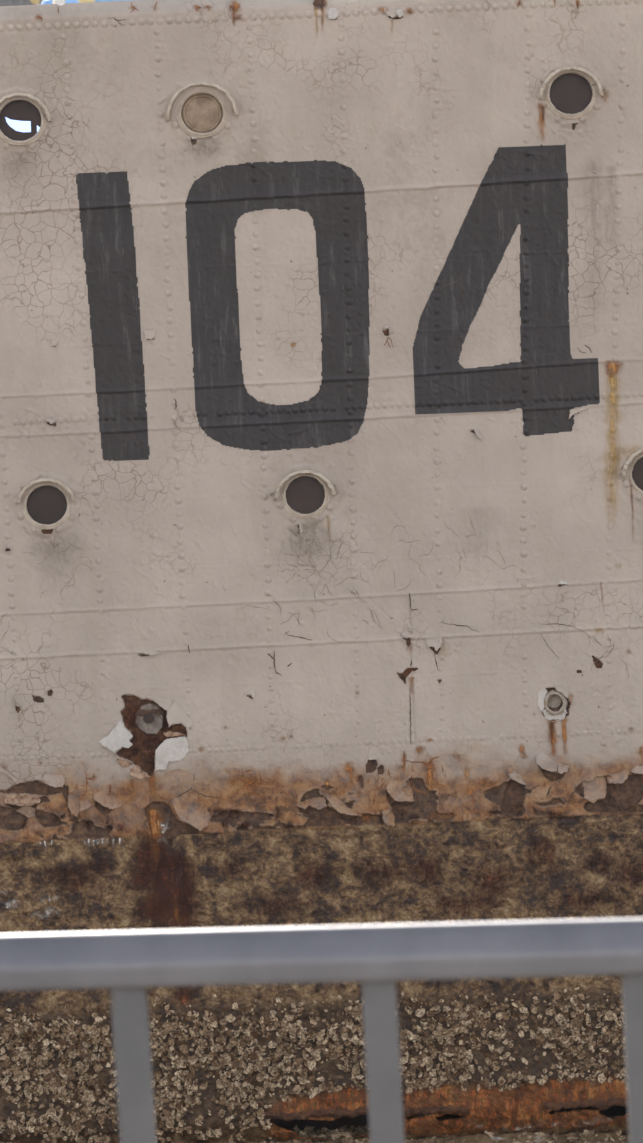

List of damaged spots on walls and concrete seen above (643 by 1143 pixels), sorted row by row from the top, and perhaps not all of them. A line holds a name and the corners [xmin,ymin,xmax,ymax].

corrosion [606,361,620,498]
peeling [99,695,194,780]
corrosion [132,721,169,795]
corrosion [549,718,567,755]
peeling [0,767,126,823]
peeling [145,794,211,836]
peeling [294,793,357,827]
peeling [366,756,414,826]
peeling [582,766,643,813]
corrosion [130,809,195,930]
corrosion [264,1087,369,1139]
corrosion [402,1075,629,1135]